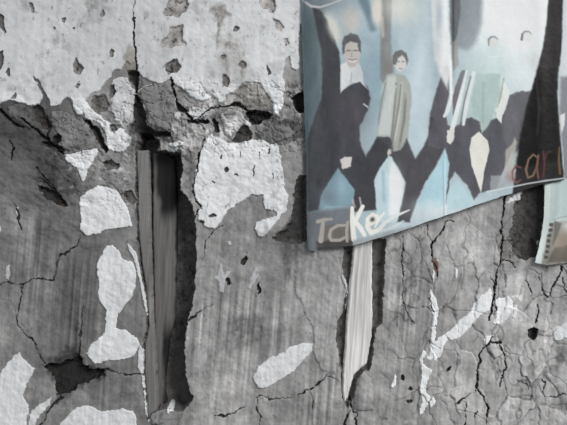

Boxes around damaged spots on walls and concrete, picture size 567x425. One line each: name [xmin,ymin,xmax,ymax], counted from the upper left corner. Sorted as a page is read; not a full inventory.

crack [131,0,139,93]
crack [20,117,64,154]
crack [170,77,252,122]
crack [0,239,79,364]
peeling [0,0,313,425]
crack [256,374,333,425]
crack [396,238,415,325]
crack [427,217,454,283]
peeling [419,270,517,415]
crack [457,336,507,425]
crack [488,195,516,321]
crack [526,265,567,323]